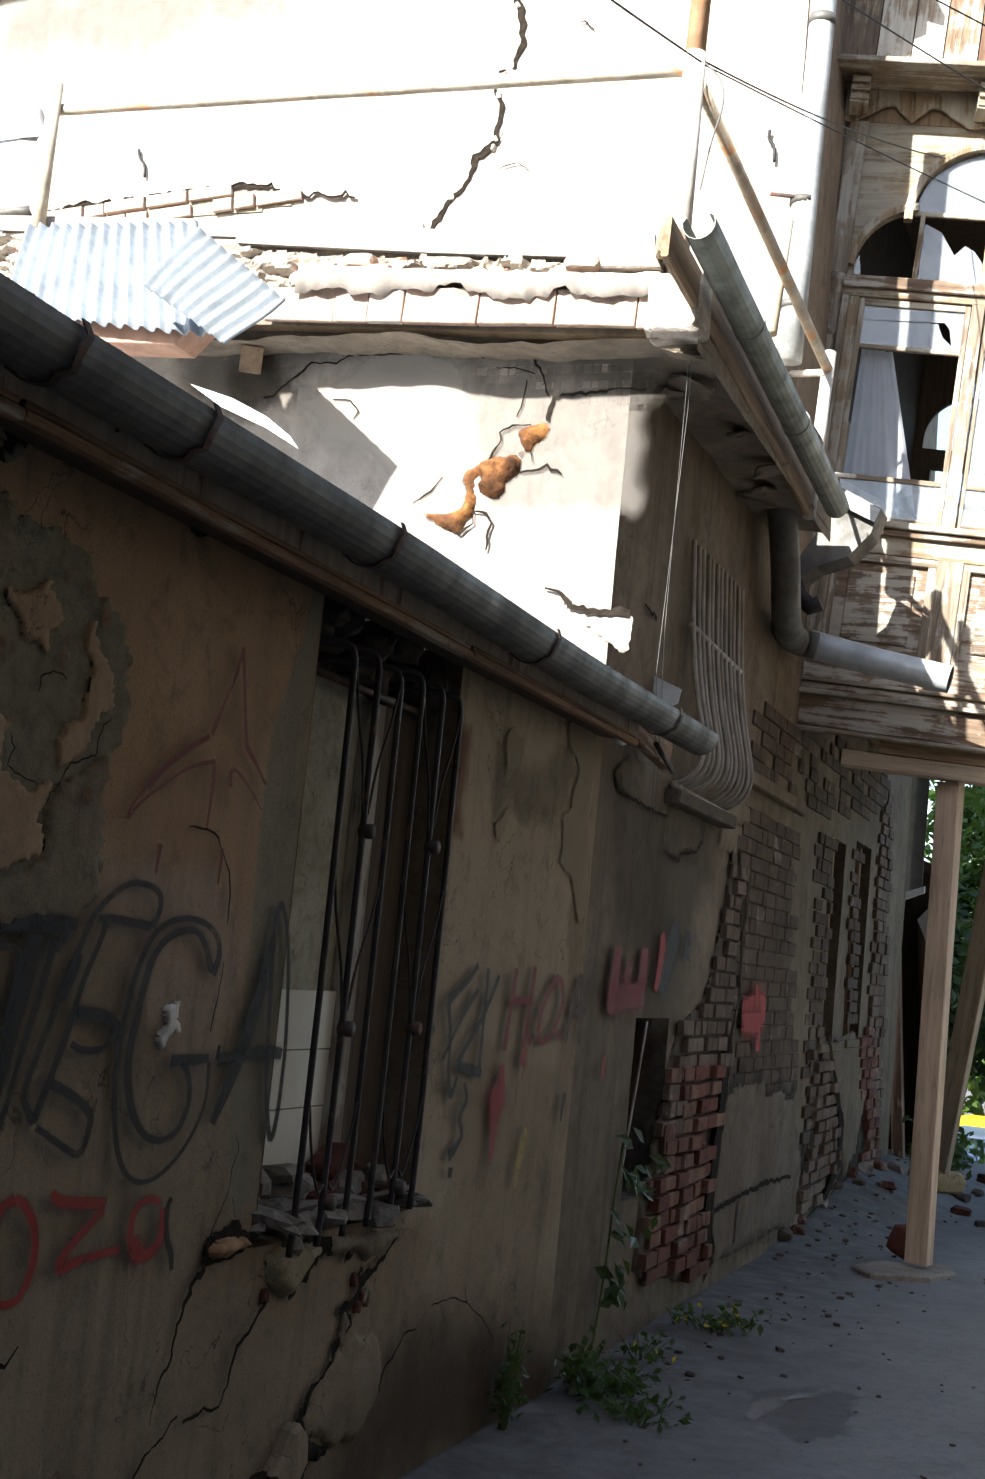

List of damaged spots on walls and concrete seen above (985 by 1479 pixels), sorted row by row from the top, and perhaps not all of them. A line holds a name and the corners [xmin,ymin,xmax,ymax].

spalling [47,179,356,218]
crack [423,0,531,229]
crack [263,353,403,420]
crack [413,476,443,504]
crack [455,510,493,550]
crack [481,357,647,475]
peeling [0,490,134,936]
spalling [615,754,751,1287]
spalling [796,1026,880,1214]
crack [132,1132,269,1479]
crack [296,1237,494,1431]